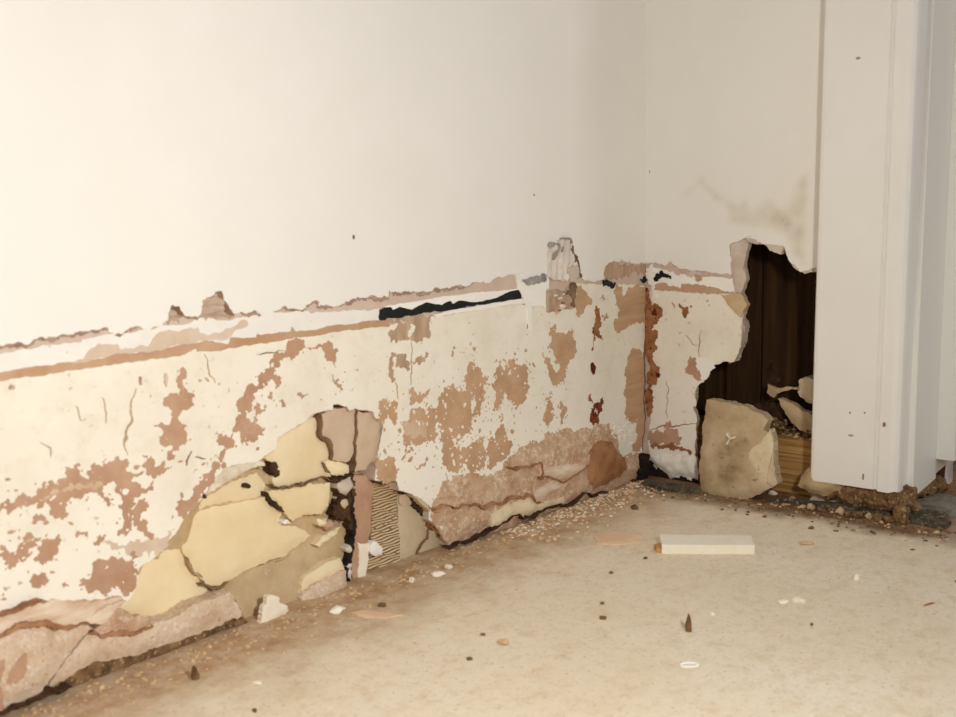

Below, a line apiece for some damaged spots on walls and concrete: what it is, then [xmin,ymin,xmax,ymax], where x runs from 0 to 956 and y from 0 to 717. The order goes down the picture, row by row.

spalling [575,235,785,363]
peeling [685,356,718,381]
flaking render [0,315,699,711]
spalling [767,431,783,488]